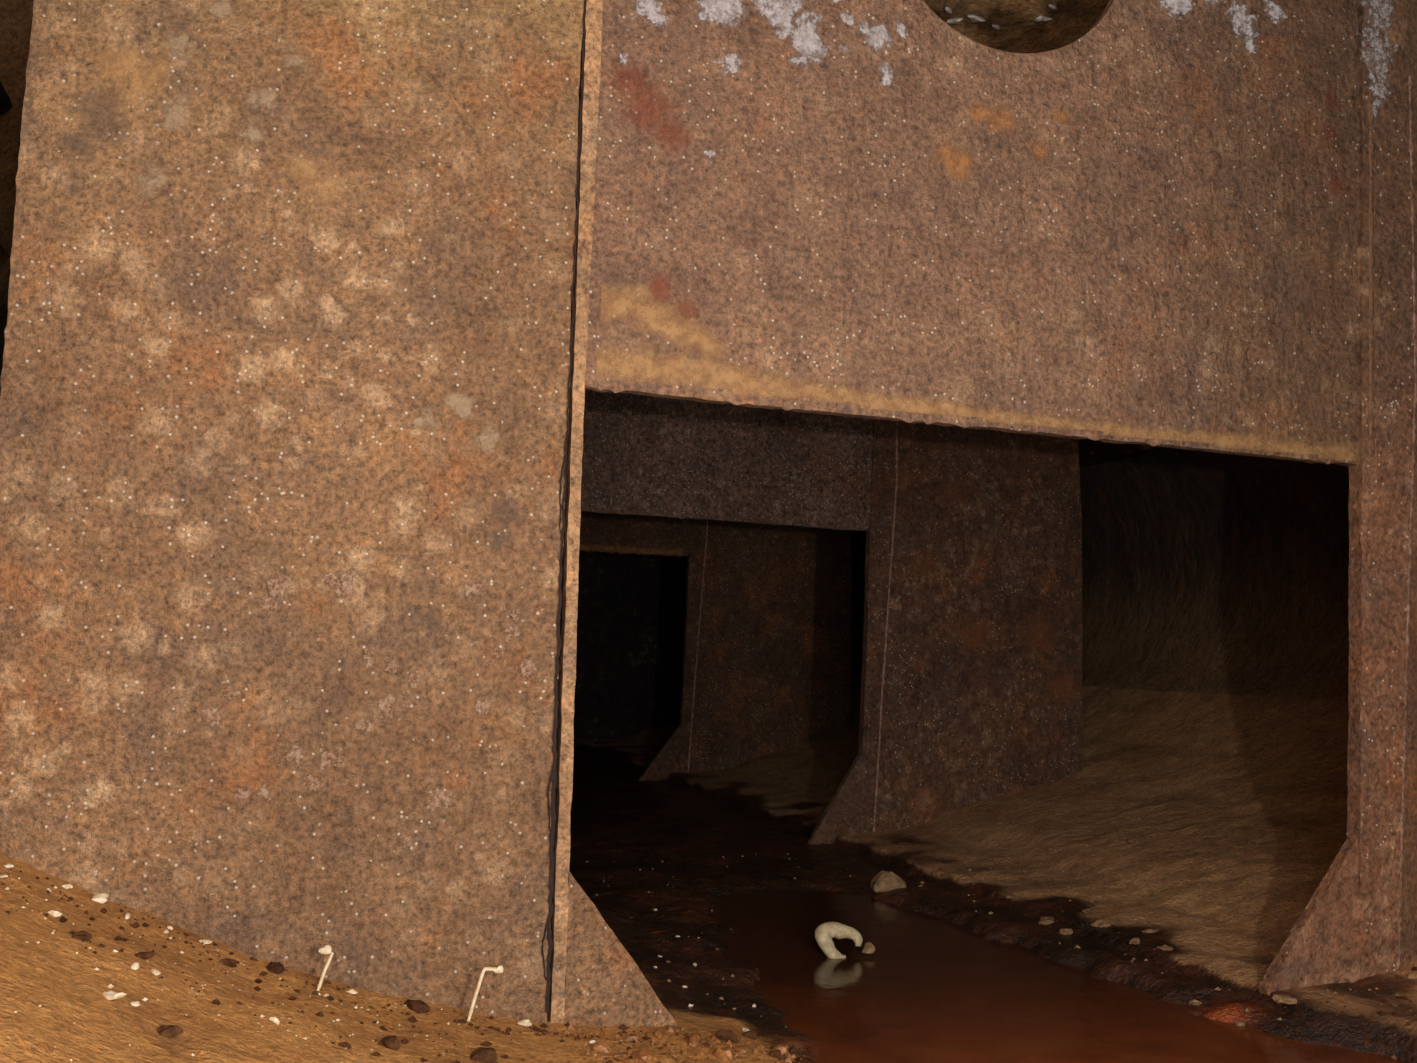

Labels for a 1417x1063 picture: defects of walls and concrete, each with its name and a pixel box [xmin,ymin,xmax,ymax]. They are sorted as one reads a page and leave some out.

damp [636,0,668,26]
damp [713,54,741,75]
damp [697,0,849,65]
damp [833,0,905,85]
damp [1161,0,1287,53]
damp [1360,0,1398,117]